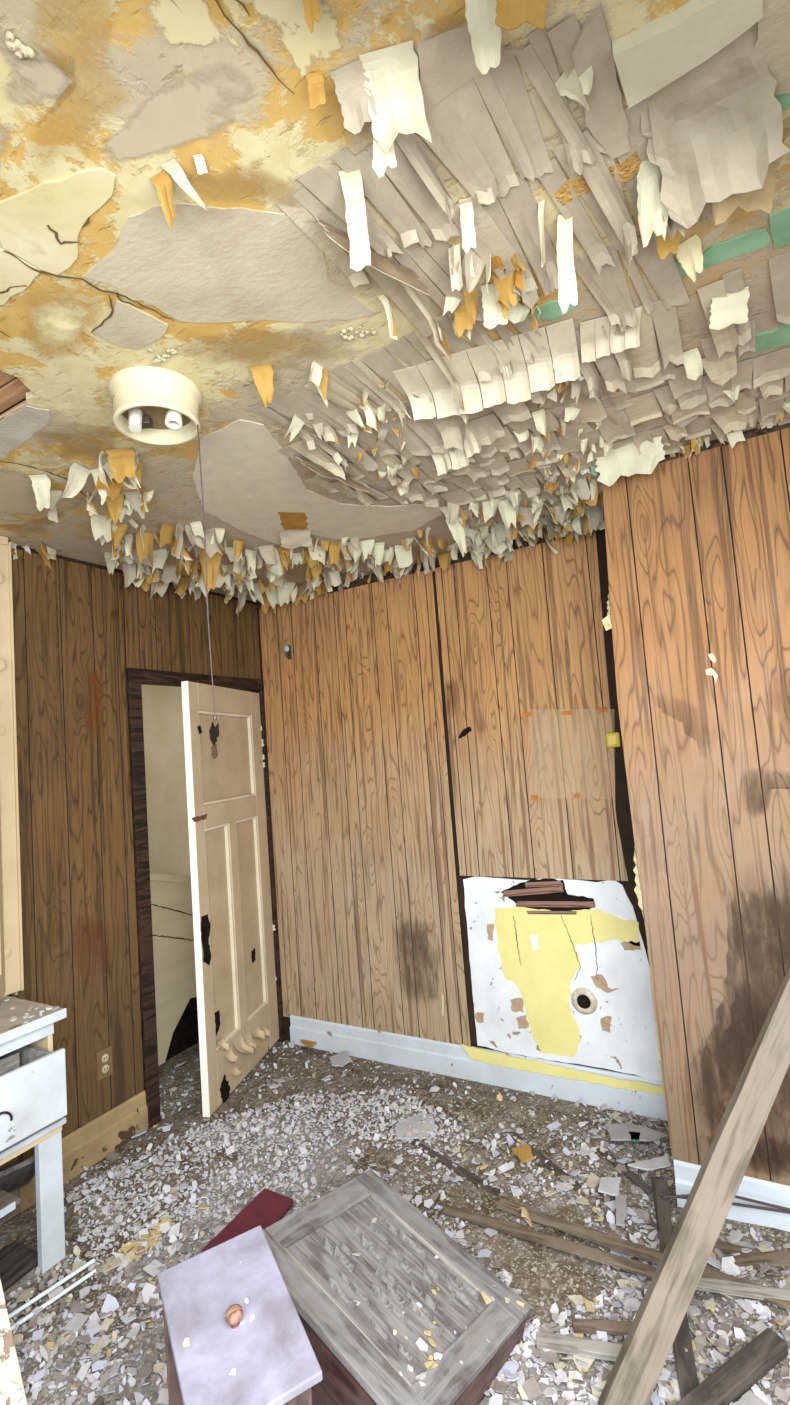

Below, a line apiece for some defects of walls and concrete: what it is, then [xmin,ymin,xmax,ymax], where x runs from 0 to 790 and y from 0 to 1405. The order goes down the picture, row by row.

crack [0,217,175,333]
flaking render [0,0,790,615]
flaking render [463,876,663,1081]
leakage [703,903,790,1122]
leakage [750,1141,790,1172]